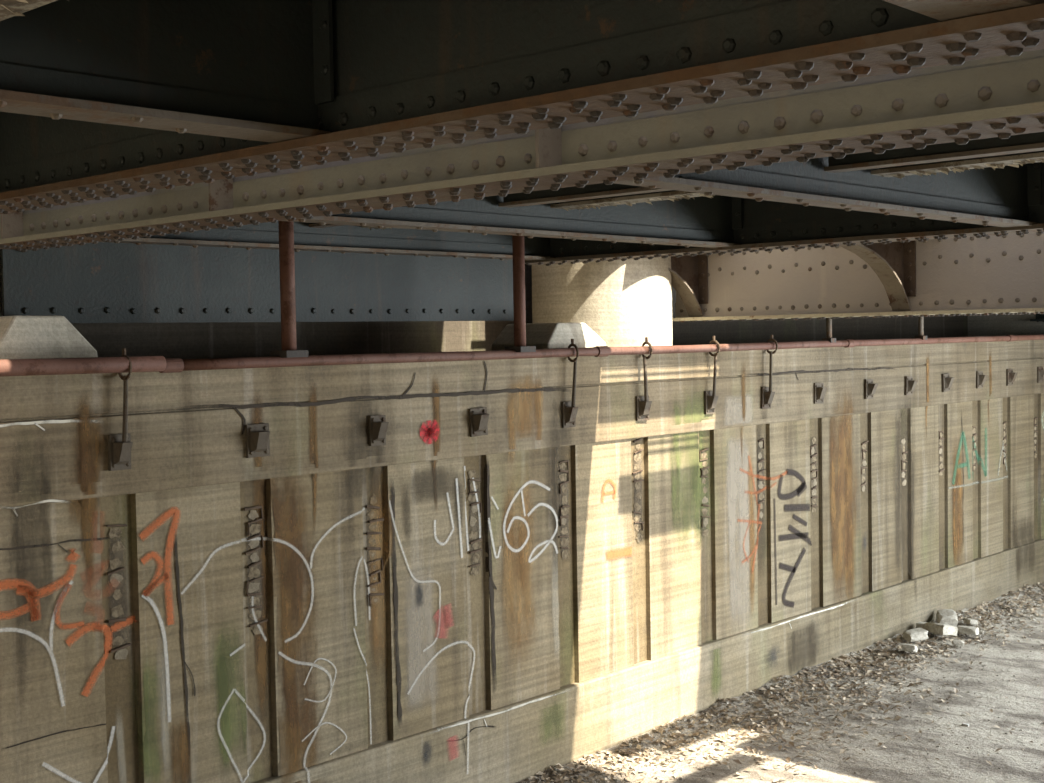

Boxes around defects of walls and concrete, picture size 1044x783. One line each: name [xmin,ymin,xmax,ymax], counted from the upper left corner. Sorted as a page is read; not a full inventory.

corrosion [71,404,102,577]
spalling [106,524,131,659]
spalling [243,505,268,635]
corrosion [253,392,318,783]
spalling [366,494,384,606]
corrosion [505,487,532,647]